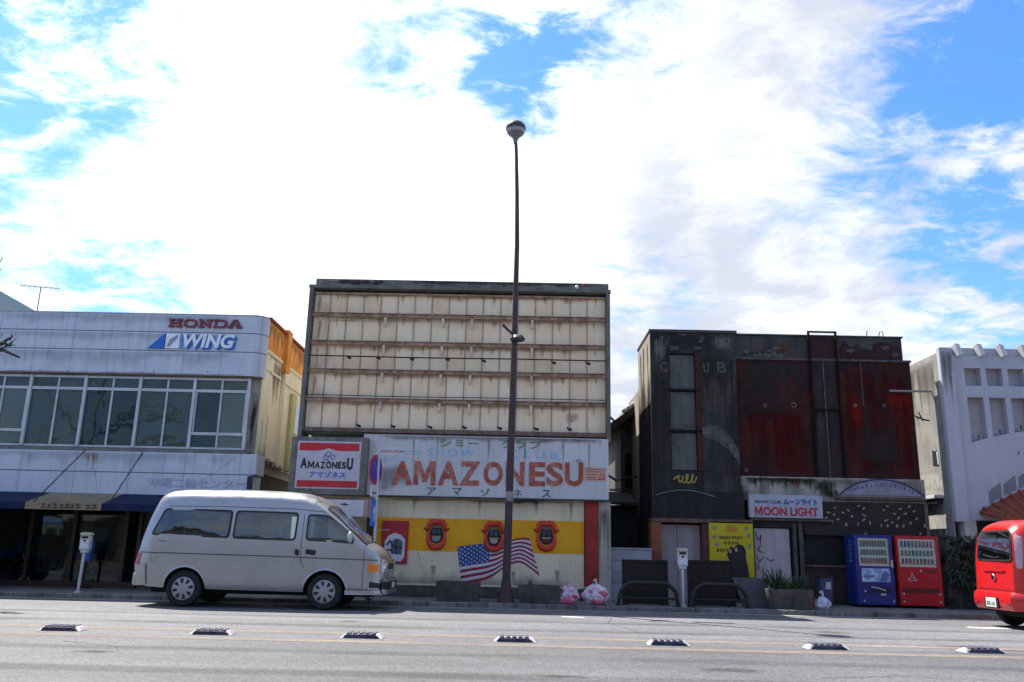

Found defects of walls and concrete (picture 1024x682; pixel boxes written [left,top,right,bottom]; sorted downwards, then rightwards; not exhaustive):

peeling [839,341,902,360]